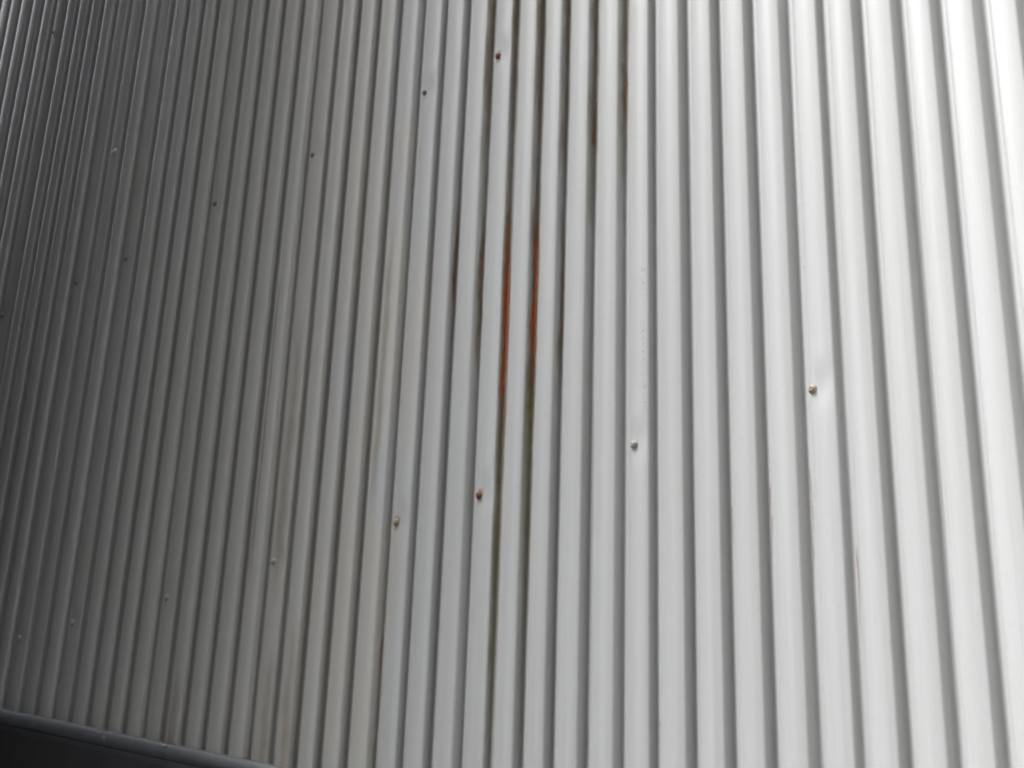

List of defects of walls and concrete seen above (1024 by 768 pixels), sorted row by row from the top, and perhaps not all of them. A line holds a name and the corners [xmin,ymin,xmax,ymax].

corrosion [501,241,510,395]